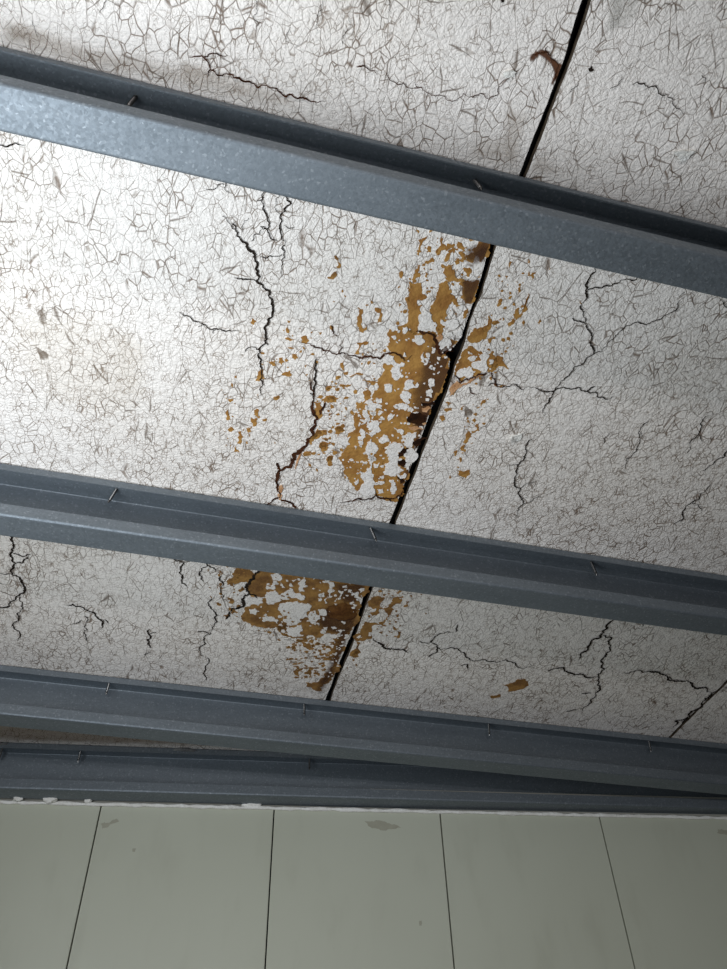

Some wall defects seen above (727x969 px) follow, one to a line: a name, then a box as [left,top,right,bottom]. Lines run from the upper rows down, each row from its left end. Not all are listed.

crack [357,47,578,102]
rust [530,50,562,85]
crack [179,192,294,396]
rust [464,281,478,302]
rust [468,244,488,261]
crack [454,268,685,416]
crack [268,325,412,509]
rust [414,341,455,451]
crack [0,537,29,640]
rust [339,585,361,601]
rust [321,610,351,686]
crack [373,620,726,727]